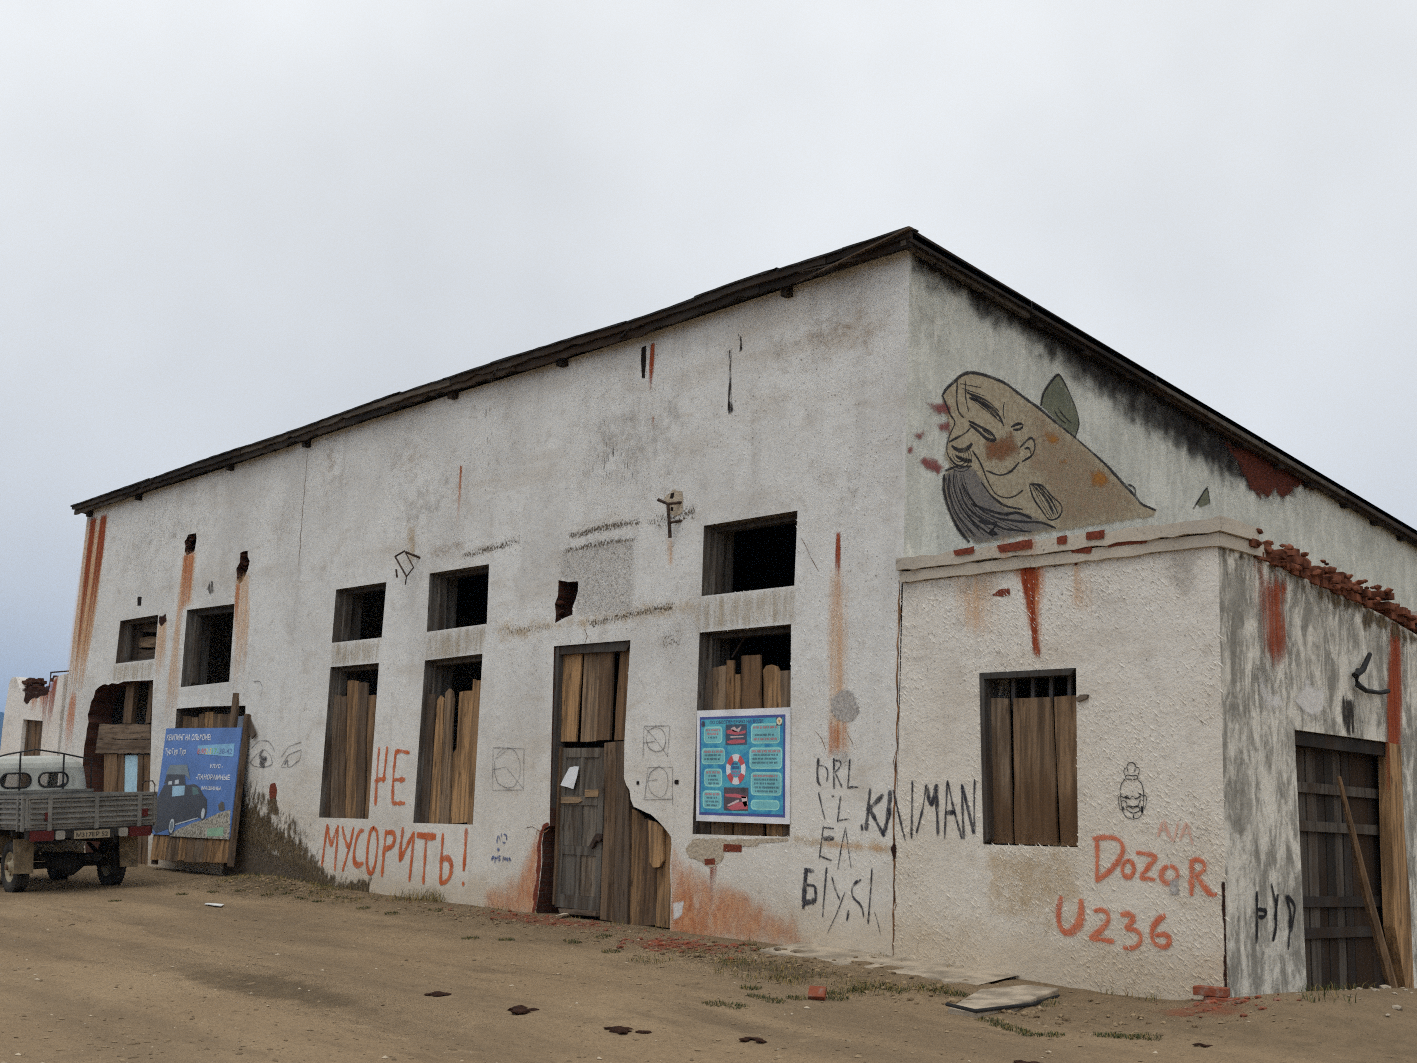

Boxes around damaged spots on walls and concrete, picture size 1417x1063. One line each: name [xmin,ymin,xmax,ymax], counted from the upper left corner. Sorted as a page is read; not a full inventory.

rust [73,515,106,646]
rust [160,554,193,653]
rust [1021,567,1040,656]
spalling [22,675,58,704]
rust [492,848,537,913]
spalling [673,901,684,919]
rust [676,867,779,936]
spalling [686,838,788,867]